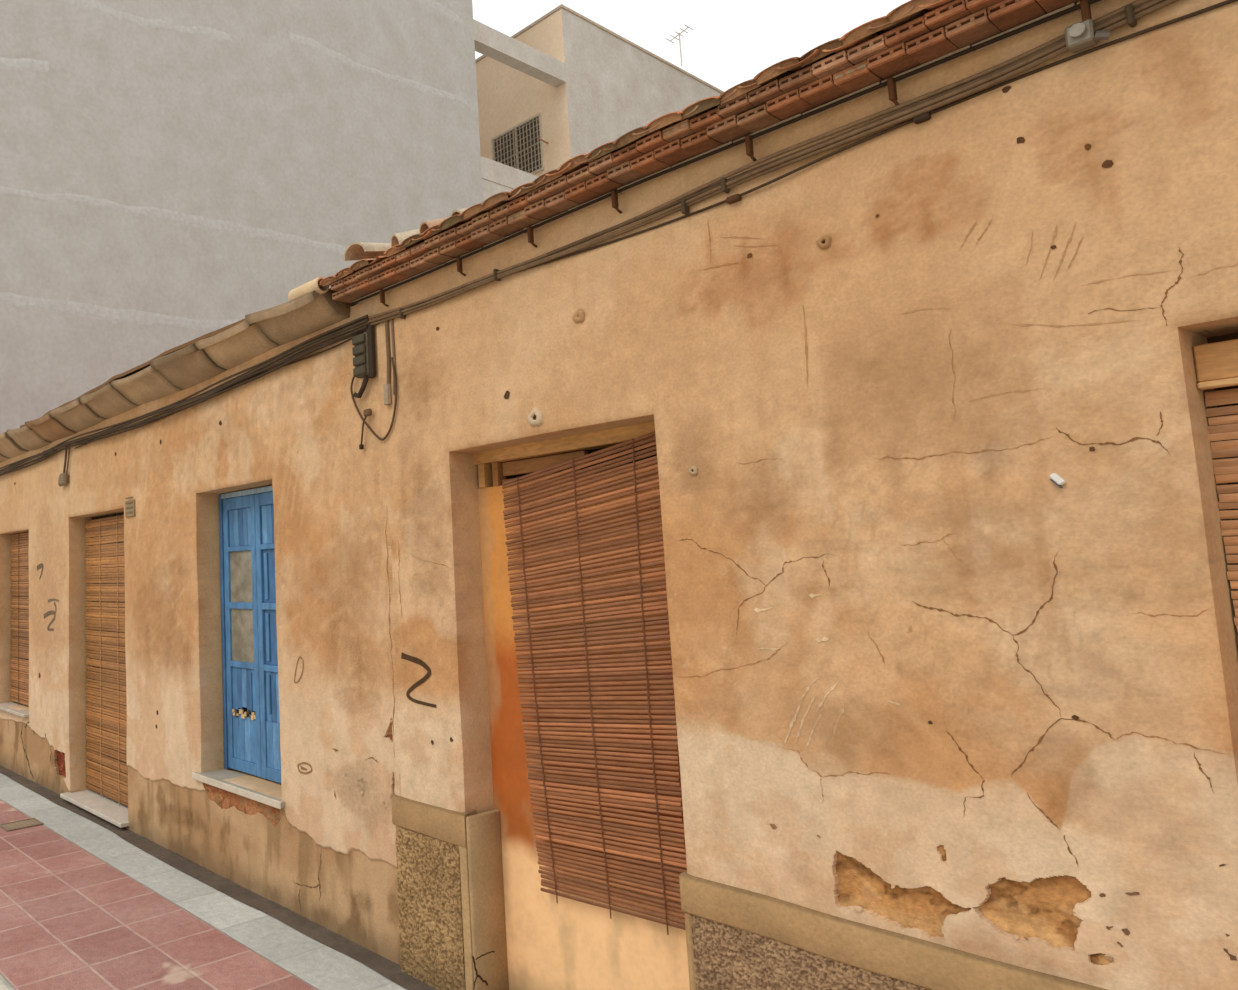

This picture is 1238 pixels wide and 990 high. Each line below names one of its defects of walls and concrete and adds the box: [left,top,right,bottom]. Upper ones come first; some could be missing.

crack [1088,248,1184,326]
crack [948,332,956,421]
crack [878,412,1170,460]
crack [912,552,1229,865]
flaking render [203,783,281,827]
crack [780,746,890,796]
flaking render [835,852,1091,948]
flaking render [1090,953,1114,965]